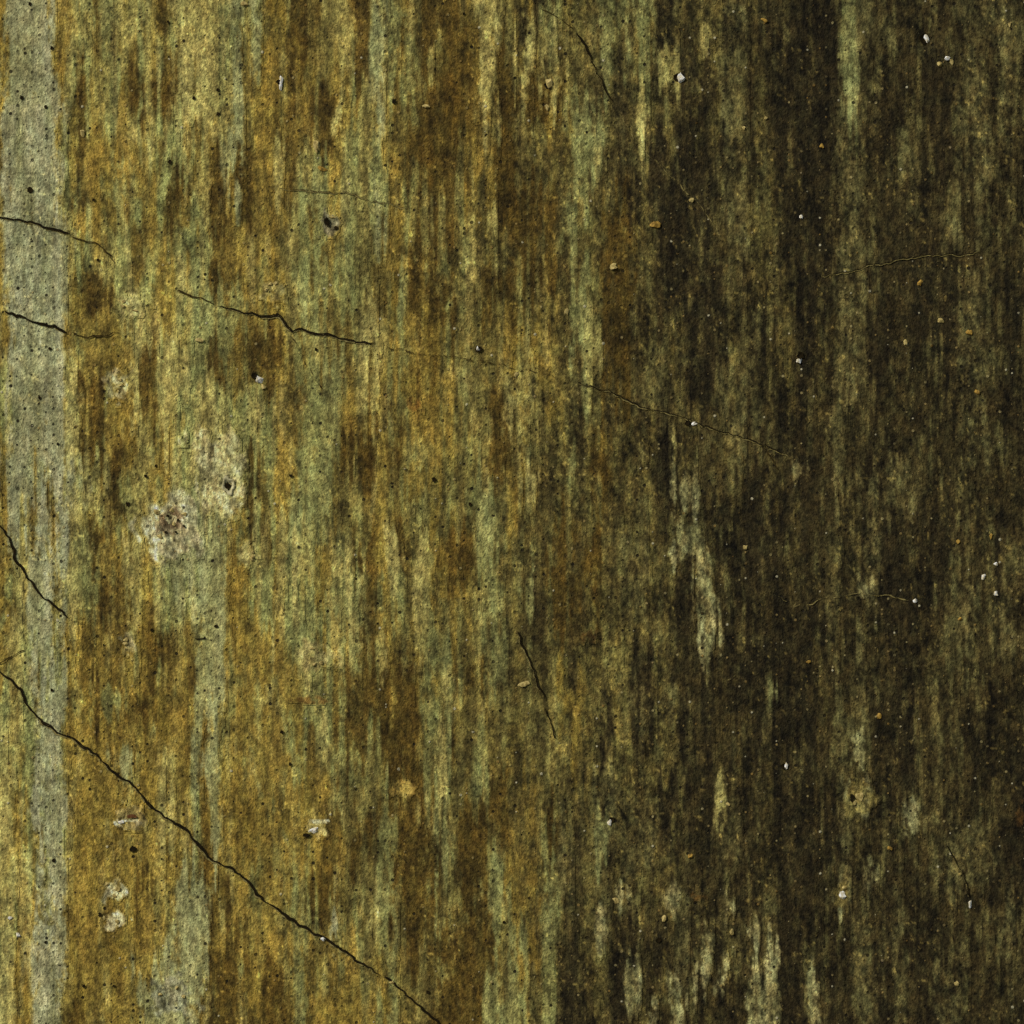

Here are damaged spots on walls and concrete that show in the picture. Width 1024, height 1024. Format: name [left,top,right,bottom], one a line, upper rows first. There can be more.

crack [0,217,114,262]
crack [5,311,119,338]
crack [177,290,553,389]
crack [0,526,68,618]
crack [517,631,555,738]
crack [0,650,440,1024]